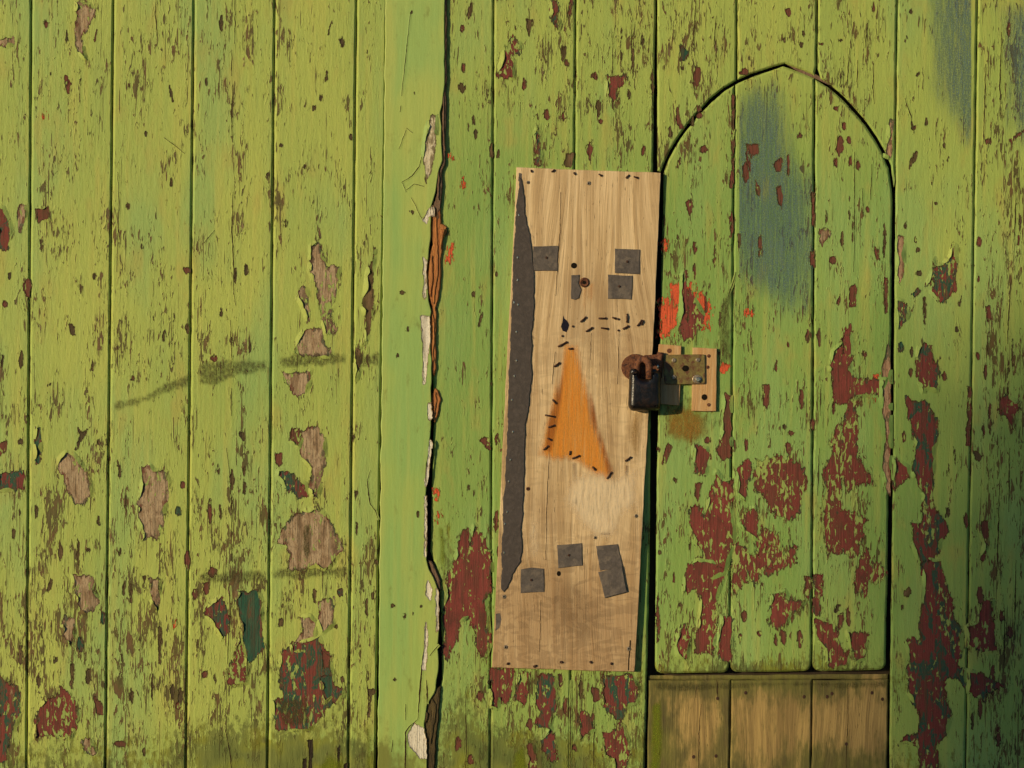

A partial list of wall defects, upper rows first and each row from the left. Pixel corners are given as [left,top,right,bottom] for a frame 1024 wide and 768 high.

spalling [405,0,473,423]
peeling [282,229,342,398]
peeling [656,242,722,344]
peeling [55,427,101,506]
peeling [124,462,185,542]
peeling [274,425,344,572]
peeling [672,222,1023,768]
peeling [0,539,105,764]
peeling [192,567,265,689]
peeling [270,588,347,732]
peeling [391,439,642,768]